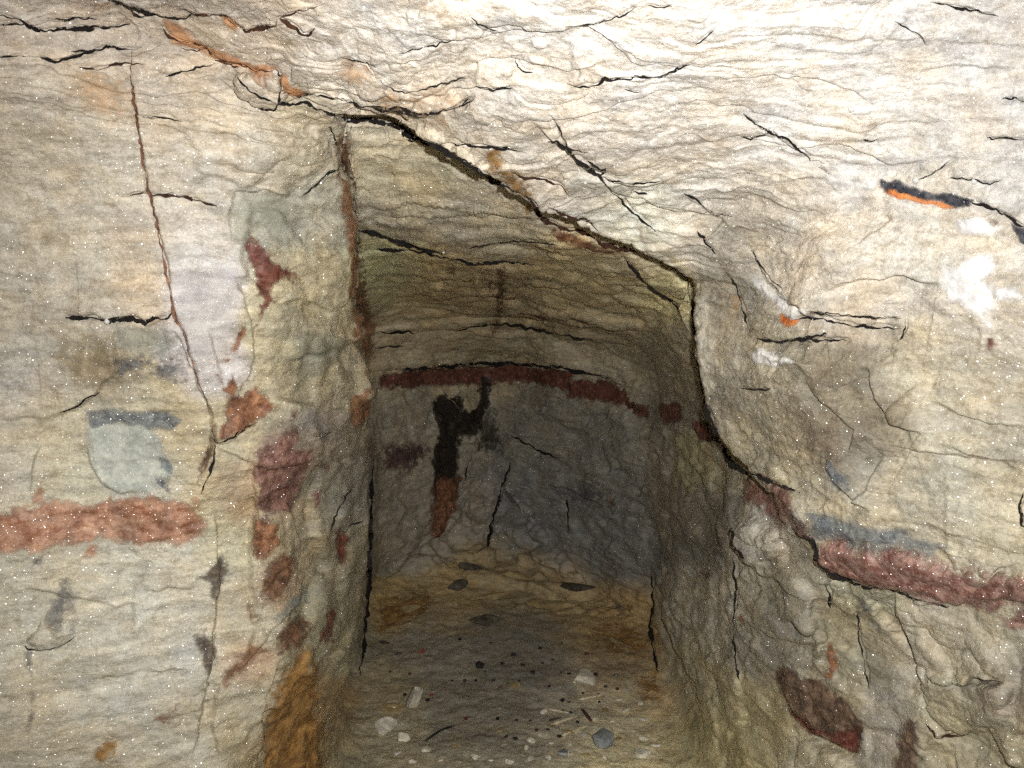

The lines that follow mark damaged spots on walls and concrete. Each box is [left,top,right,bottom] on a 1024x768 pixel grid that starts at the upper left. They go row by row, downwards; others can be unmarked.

crack [0,0,533,195]
crack [122,192,217,207]
crack [547,112,660,232]
crack [919,159,1024,227]
crack [65,313,176,326]
crack [358,171,703,394]
crack [476,435,563,553]
crack [729,527,744,680]